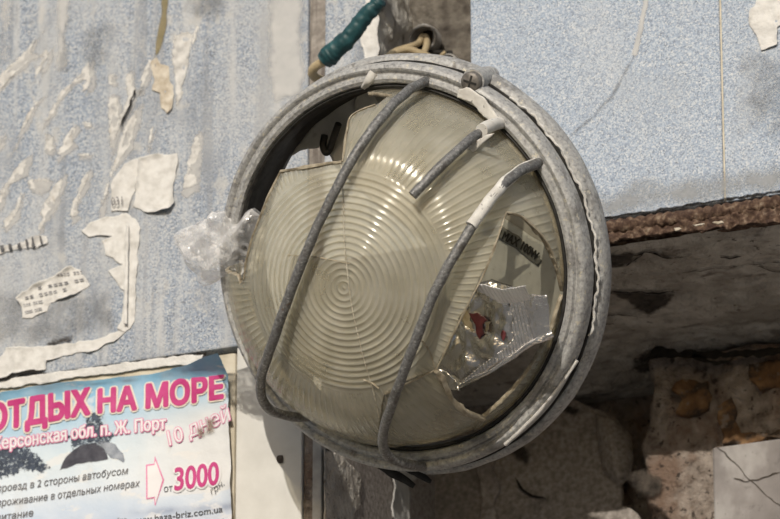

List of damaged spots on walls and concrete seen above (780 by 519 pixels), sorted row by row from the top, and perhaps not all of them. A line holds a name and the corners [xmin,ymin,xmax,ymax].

peeling [749,0,780,51]
corrosion [606,194,780,244]
corrosion [340,246,444,272]
spalling [610,291,676,314]
crack [717,447,780,505]